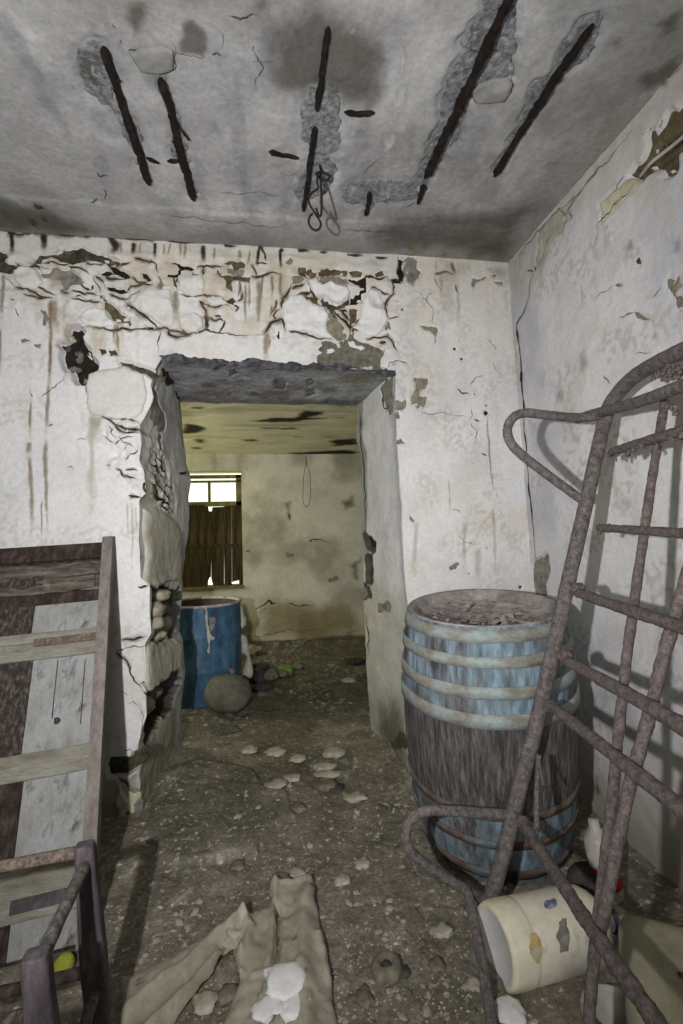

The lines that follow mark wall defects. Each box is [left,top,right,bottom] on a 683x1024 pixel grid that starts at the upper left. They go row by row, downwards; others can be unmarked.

spalling [76,38,198,202]
spalling [269,0,518,216]
spalling [493,11,603,178]
spalling [600,109,683,223]
spalling [0,250,18,274]
spalling [59,331,117,386]
spalling [34,248,194,324]
spalling [159,257,428,419]
crack [422,130,641,559]
damp [27,444,47,528]
crack [78,416,173,514]
flaking render [150,387,165,451]